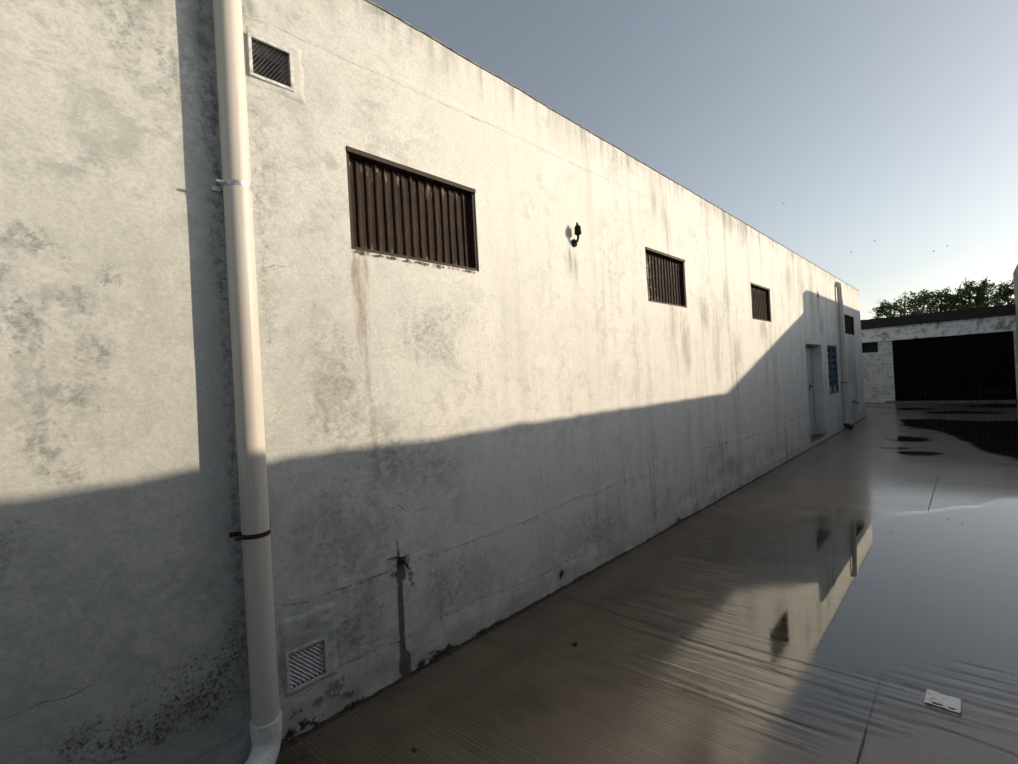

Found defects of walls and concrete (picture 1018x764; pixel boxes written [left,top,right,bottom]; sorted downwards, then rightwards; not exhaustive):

peeling [281,677,365,744]